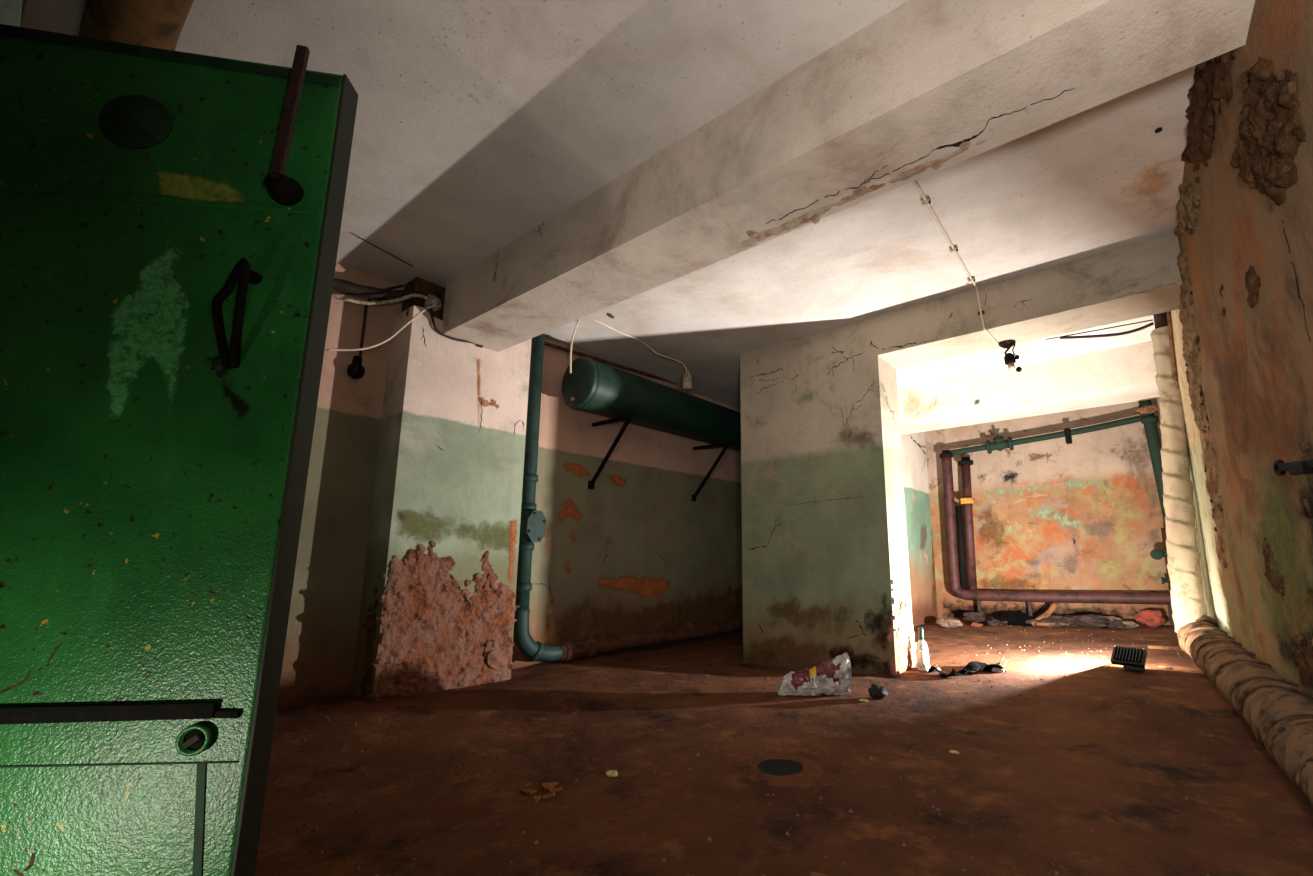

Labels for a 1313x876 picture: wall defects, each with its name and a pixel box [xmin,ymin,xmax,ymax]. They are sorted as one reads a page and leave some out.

crack [766,88,1074,224]
flaking render [1174,51,1306,568]
crack [1281,220,1310,342]
crack [750,312,953,464]
flaking render [361,541,520,702]
peeling [599,575,668,597]
leakage [749,600,891,674]